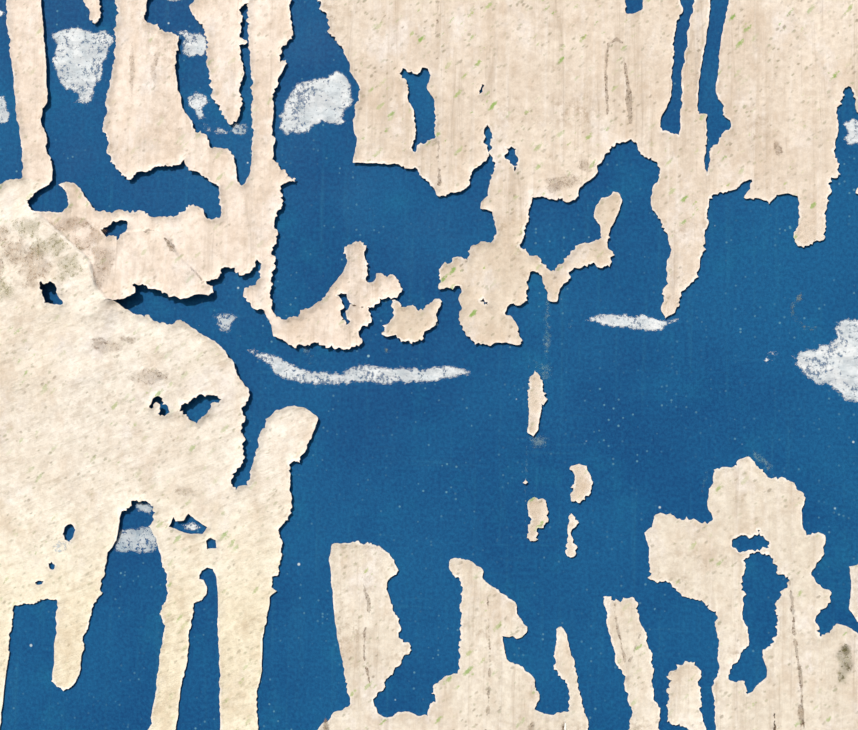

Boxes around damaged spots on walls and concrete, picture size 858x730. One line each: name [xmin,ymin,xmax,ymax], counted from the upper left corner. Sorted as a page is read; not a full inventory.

peeling [6,0,858,350]
peeling [527,372,547,436]
peeling [570,464,593,503]
peeling [527,497,549,541]
peeling [565,513,579,557]
peeling [604,457,858,730]
peeling [318,541,589,730]